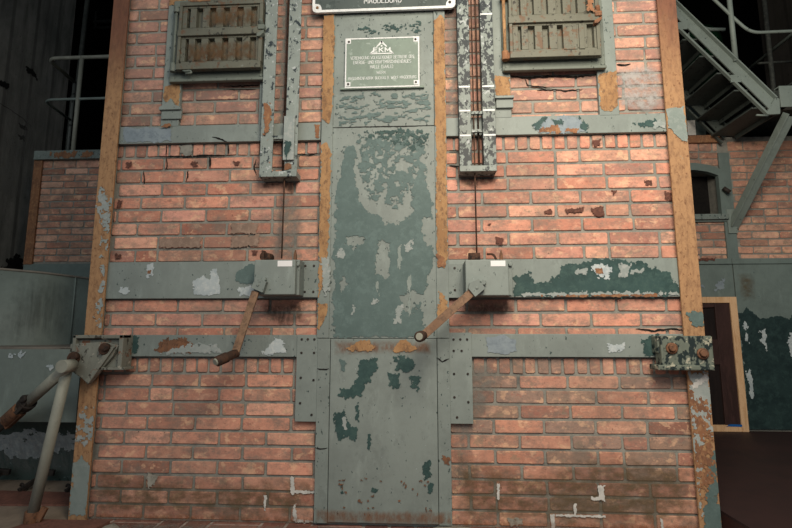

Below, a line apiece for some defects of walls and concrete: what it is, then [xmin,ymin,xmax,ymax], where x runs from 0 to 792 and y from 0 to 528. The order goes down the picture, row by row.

crack [512,75,595,92]
peeling [320,91,436,339]
peeling [513,257,680,299]
peeling [333,357,378,441]
peeling [387,355,421,392]
peeling [738,307,792,430]
peeling [0,428,46,459]
peeling [53,406,94,516]
peeling [422,460,434,494]
peeling [688,371,722,528]